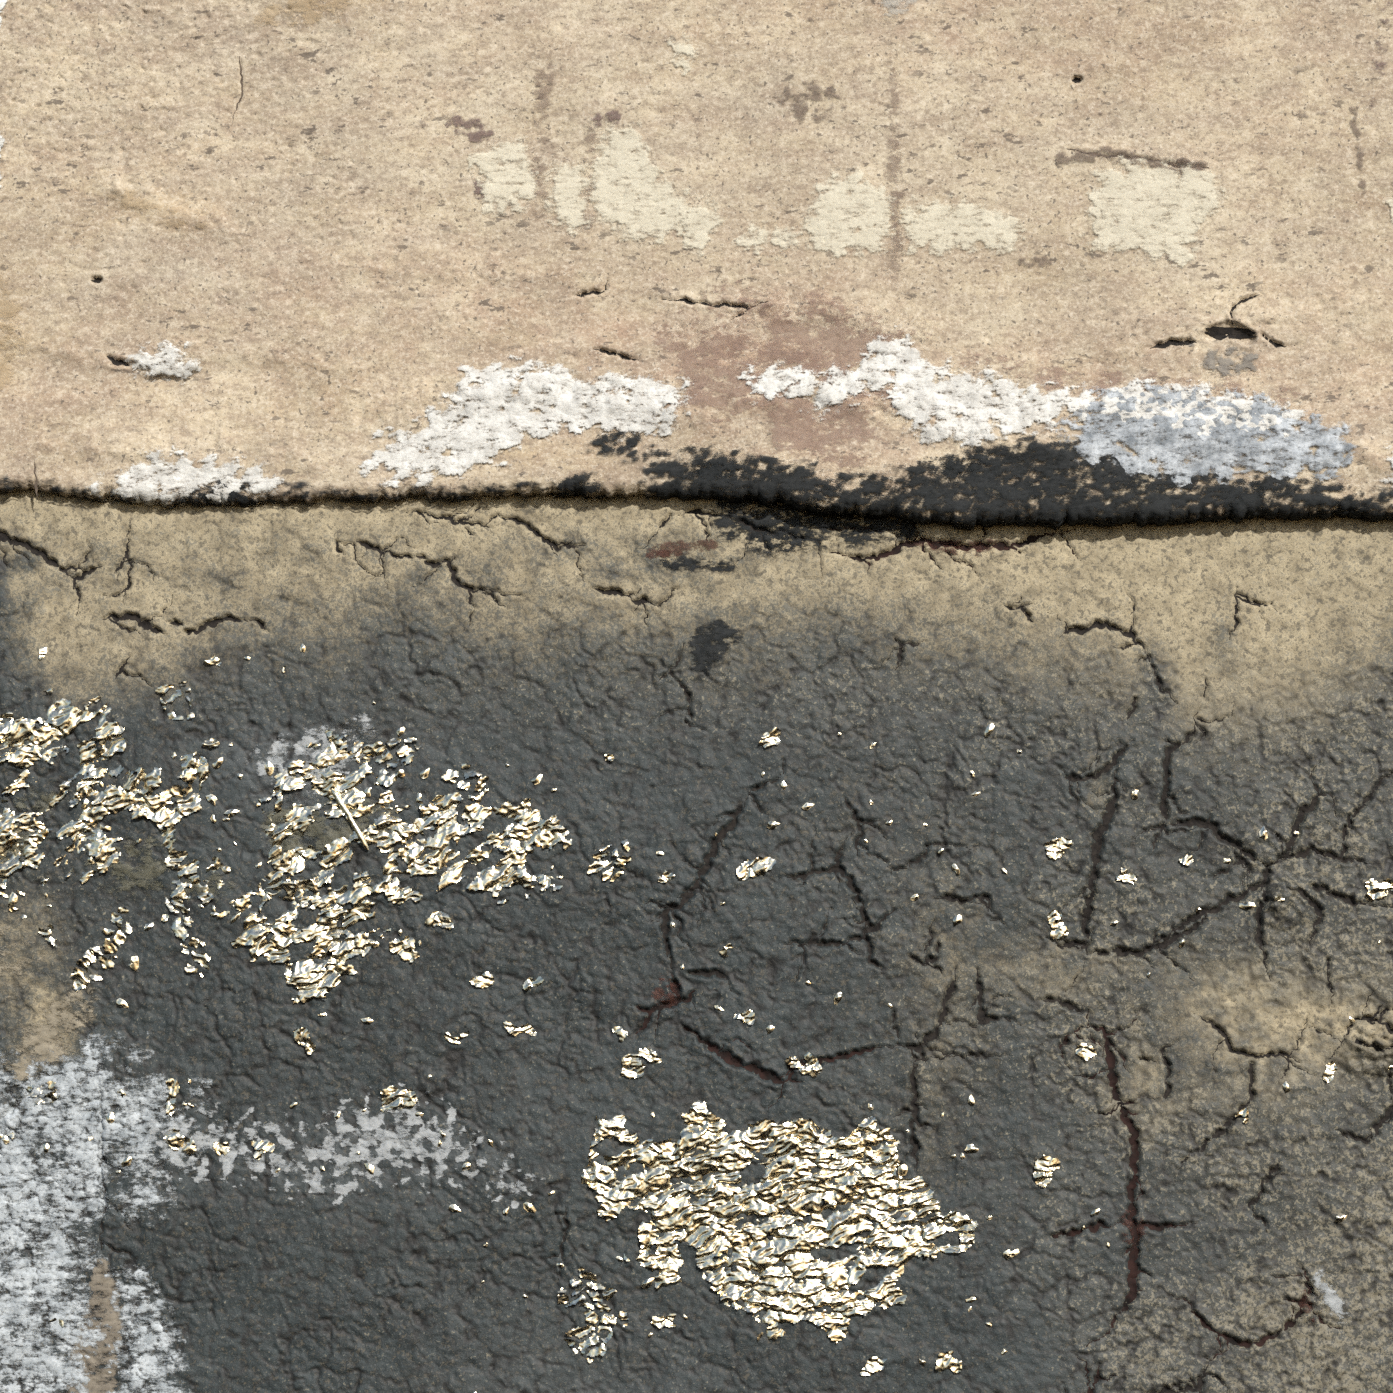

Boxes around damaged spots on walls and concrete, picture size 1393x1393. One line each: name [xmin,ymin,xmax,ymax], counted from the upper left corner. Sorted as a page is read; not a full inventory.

water stain [657,281,905,467]
water stain [962,354,1075,390]
crack [1150,340,1197,349]
crack [1230,295,1295,348]
crack [0,525,266,687]
crack [336,507,678,632]
crack [647,643,706,731]
crack [643,500,1078,576]
crack [878,638,923,670]
crack [630,759,1016,1172]
crack [1004,592,1393,1393]
crack [87,1091,137,1265]